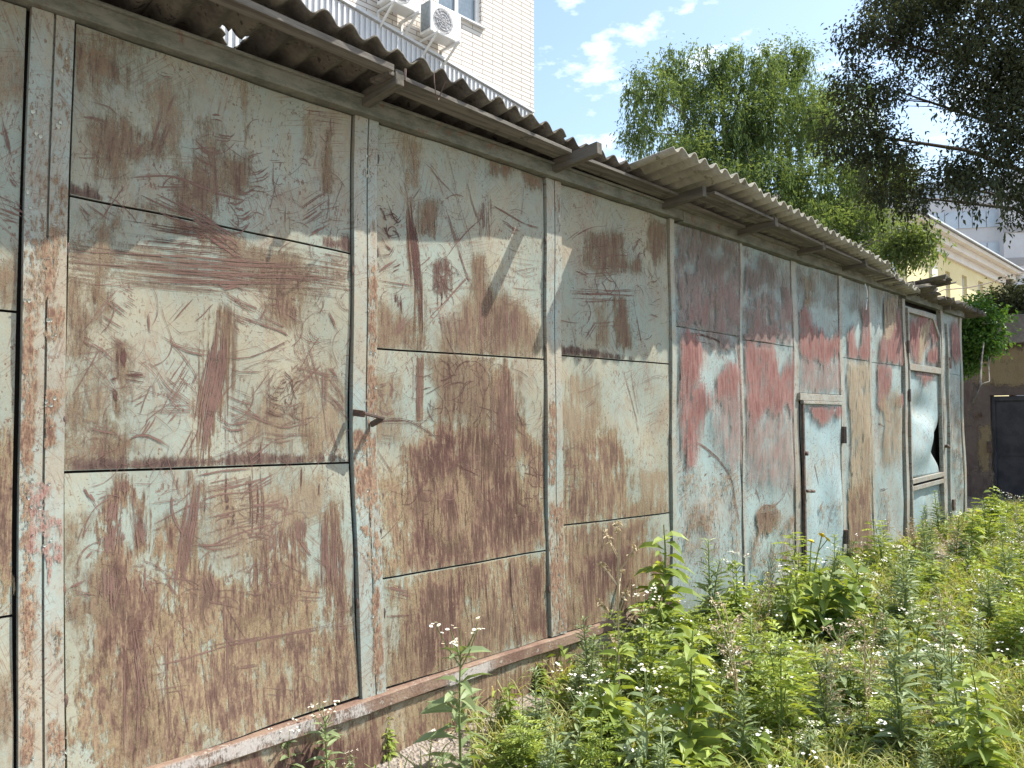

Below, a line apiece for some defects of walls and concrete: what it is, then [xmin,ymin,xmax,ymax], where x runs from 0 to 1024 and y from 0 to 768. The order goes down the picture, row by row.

rust [70,112,164,200]
rust [225,155,252,198]
rust [304,118,334,193]
rust [583,218,667,276]
rust [561,296,632,360]
rust [376,192,548,686]
peeling [679,261,938,572]
rust [65,308,358,768]
rust [562,374,671,631]
rust [756,503,781,535]
rust [220,642,590,768]